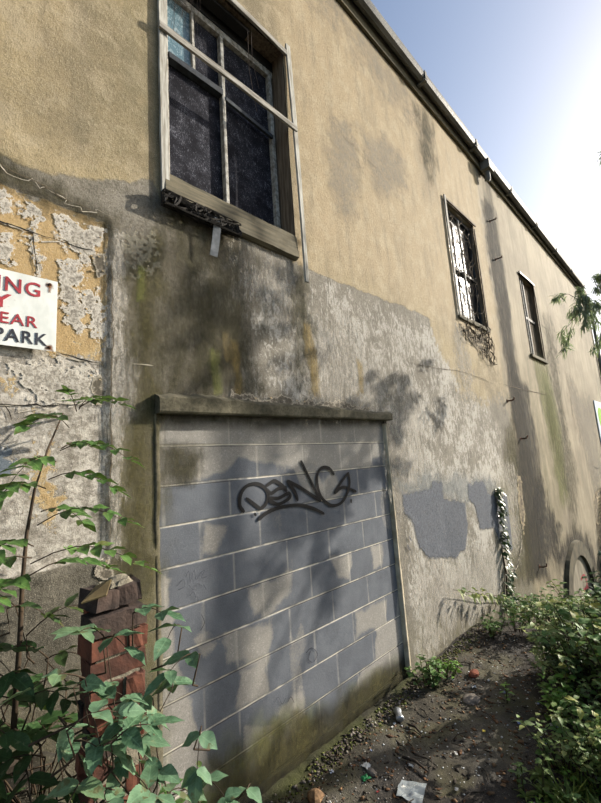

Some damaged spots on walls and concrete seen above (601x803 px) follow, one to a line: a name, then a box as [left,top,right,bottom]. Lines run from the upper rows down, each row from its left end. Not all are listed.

crack [0,163,108,218]
peeling [0,187,109,343]
peeling [8,355,107,410]
crack [0,221,118,510]
water stain [100,232,125,550]
water stain [173,216,431,522]
water stain [409,200,600,648]
spalling [94,558,115,580]
water stain [215,670,408,796]